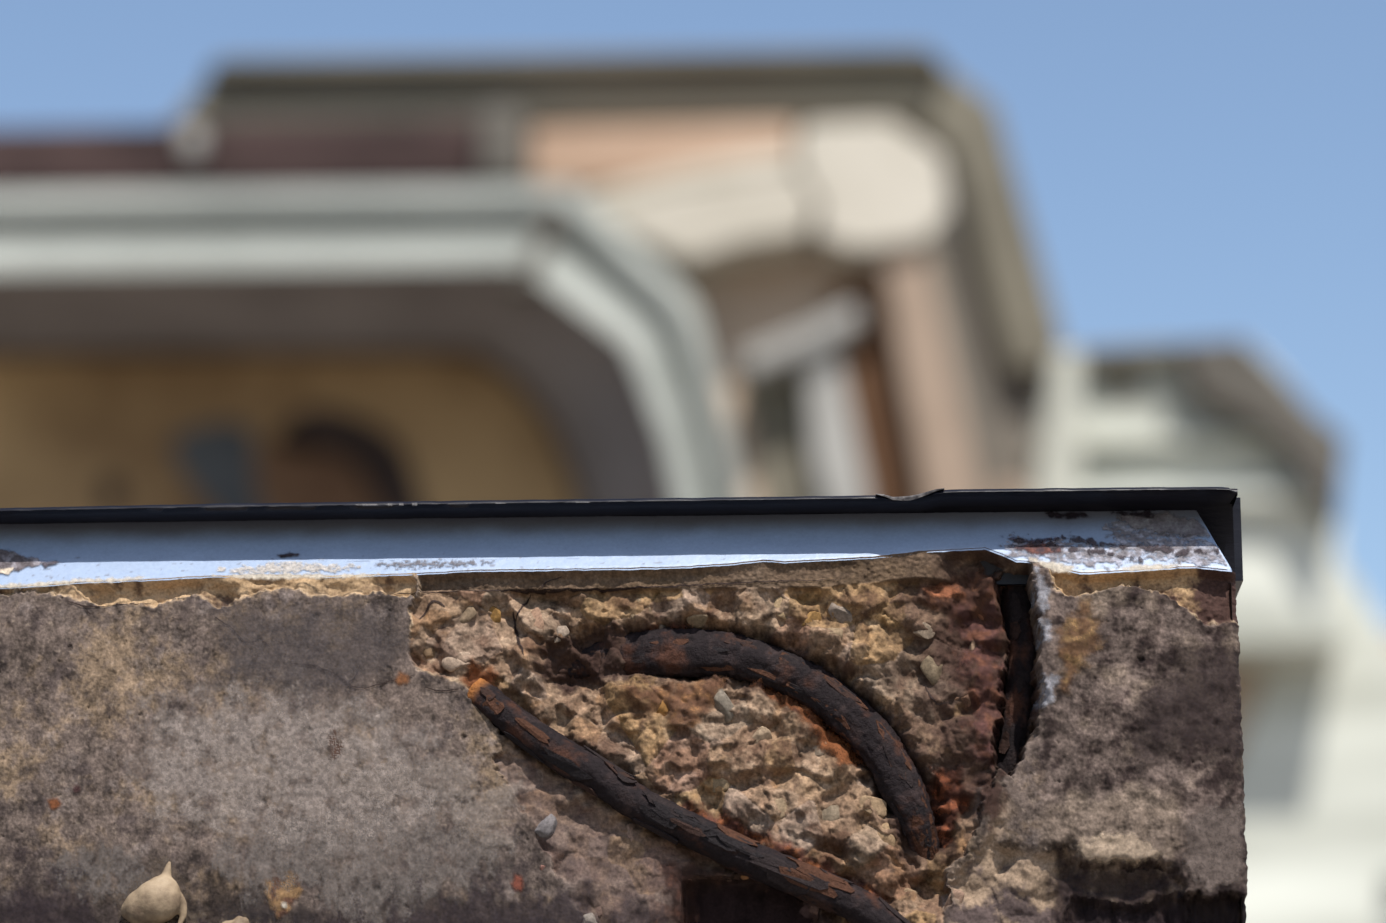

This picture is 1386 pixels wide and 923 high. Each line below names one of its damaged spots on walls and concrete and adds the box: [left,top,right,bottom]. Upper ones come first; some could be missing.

rust [461,659,592,781]
spalling [0,509,1238,923]
rust [640,800,911,923]
rust [623,571,1019,860]